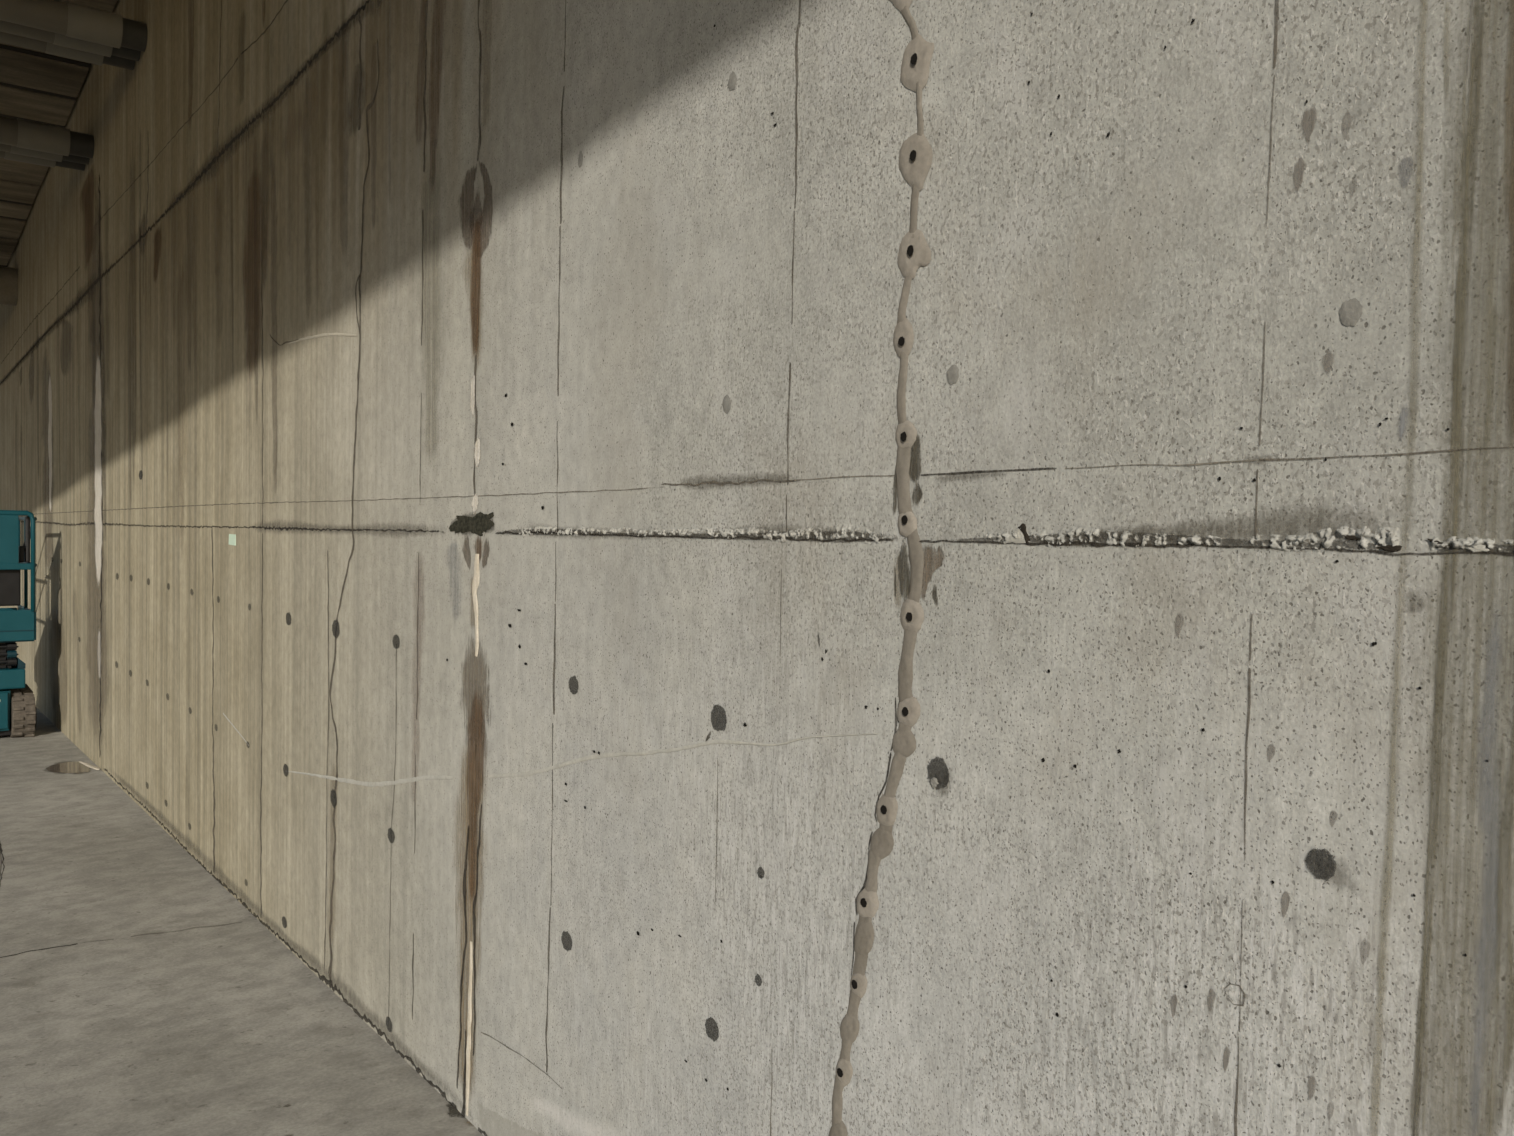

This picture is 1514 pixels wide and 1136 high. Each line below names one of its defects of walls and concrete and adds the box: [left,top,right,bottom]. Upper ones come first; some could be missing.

crack [0,0,444,979]
spalling [449,512,494,536]
crack [456,0,1514,1136]
spalling [983,523,1224,549]
spalling [1248,525,1514,563]
water stain [1436,0,1514,717]
water stain [1413,770,1449,1136]